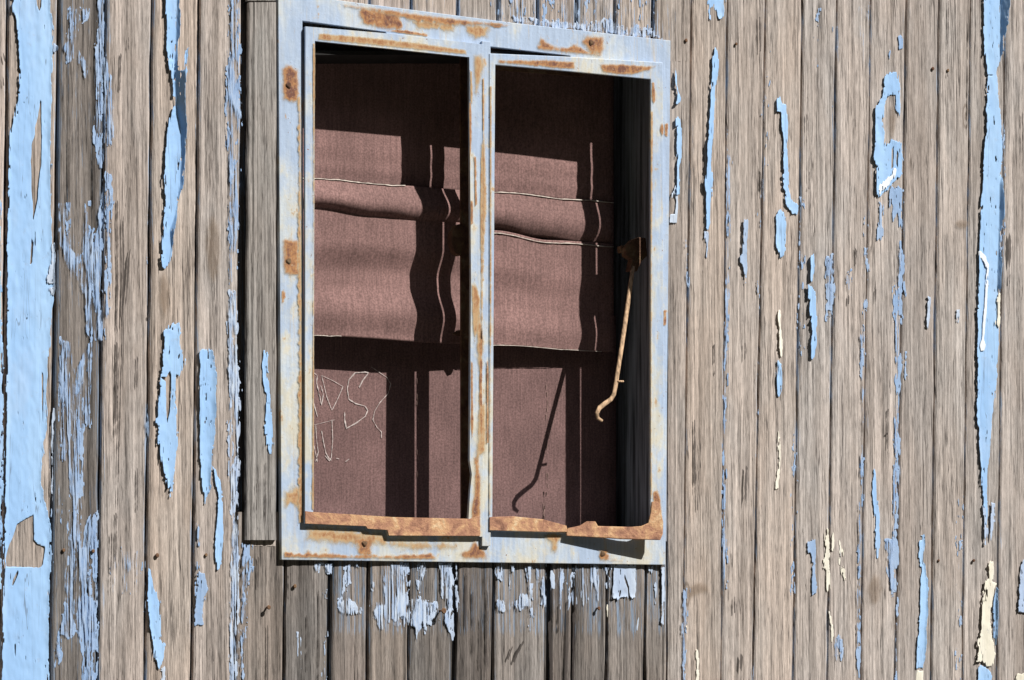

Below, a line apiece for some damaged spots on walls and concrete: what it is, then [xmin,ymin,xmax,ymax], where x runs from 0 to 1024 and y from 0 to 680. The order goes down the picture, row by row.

peeling [161,0,189,269]
rust [499,36,651,74]
peeling [0,0,114,680]
peeling [145,322,186,497]
peeling [199,0,254,680]
peeling [315,562,459,641]
rust [282,5,503,559]
rust [547,534,561,551]
peeling [495,563,665,627]
peeling [807,72,907,678]
peeling [976,561,999,680]
peeling [977,0,1010,545]